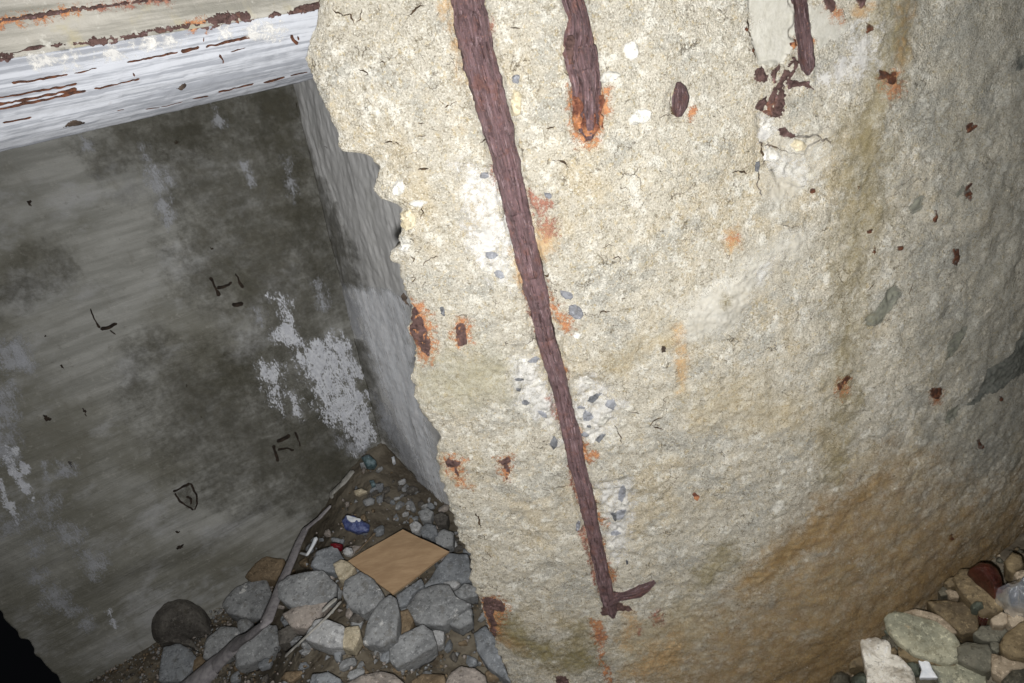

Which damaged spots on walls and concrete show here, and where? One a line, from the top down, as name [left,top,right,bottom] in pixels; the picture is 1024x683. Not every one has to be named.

corrosion [0,0,171,31]
spalling [0,2,320,70]
corrosion [127,36,250,63]
spalling [747,0,883,93]
corrosion [0,68,139,123]
spalling [671,81,690,117]
corrosion [754,39,814,138]
spalling [755,115,807,185]
leakage [119,91,446,502]
corrosion [409,298,474,366]
spalling [450,0,656,619]
leakage [674,471,1024,683]